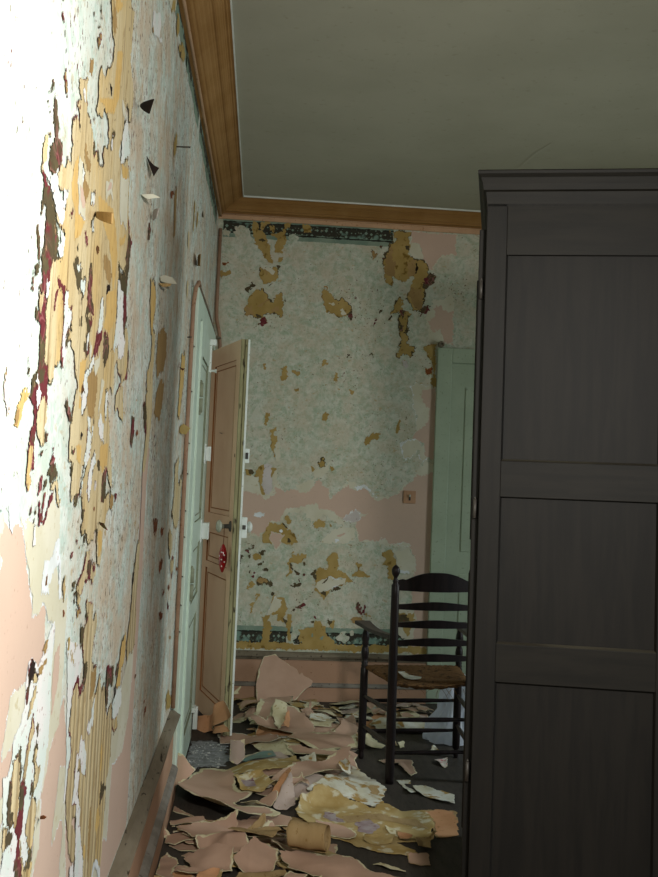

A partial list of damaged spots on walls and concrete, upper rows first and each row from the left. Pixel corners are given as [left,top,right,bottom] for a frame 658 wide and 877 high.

peeling [0,0,185,877]
peeling [236,221,455,655]